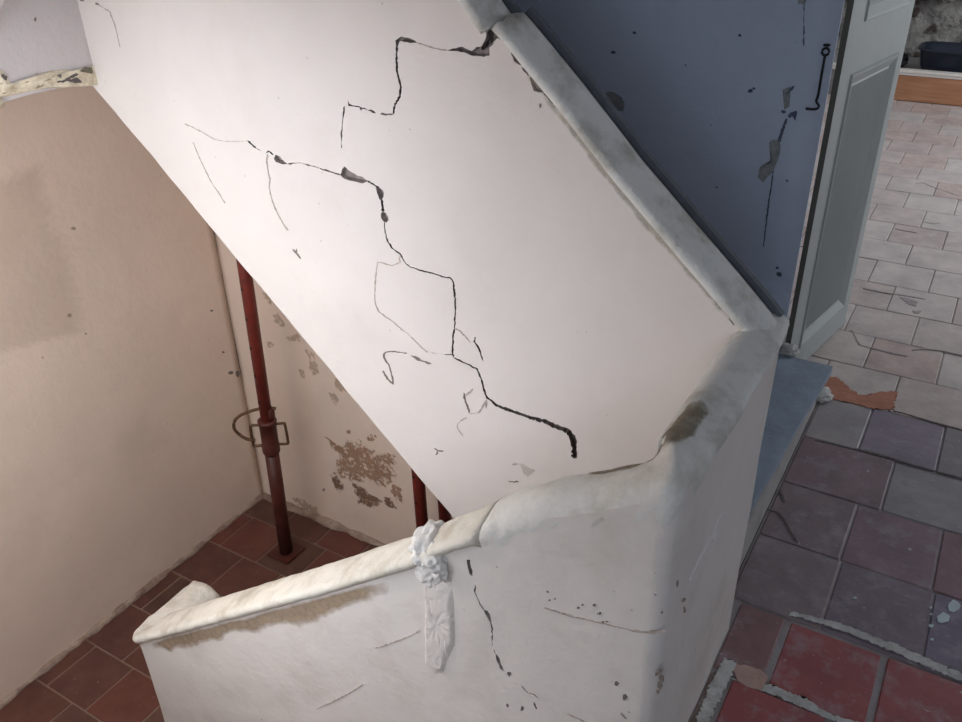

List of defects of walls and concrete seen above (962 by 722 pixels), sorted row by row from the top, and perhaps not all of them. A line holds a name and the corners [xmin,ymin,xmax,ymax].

crack [798,0,806,46]
flaking render [0,66,98,97]
peeling [781,86,797,121]
crack [778,118,787,144]
peeling [758,140,780,181]
crack [763,172,774,247]
crack [185,30,577,458]
crack [544,591,668,634]
crack [467,560,538,711]